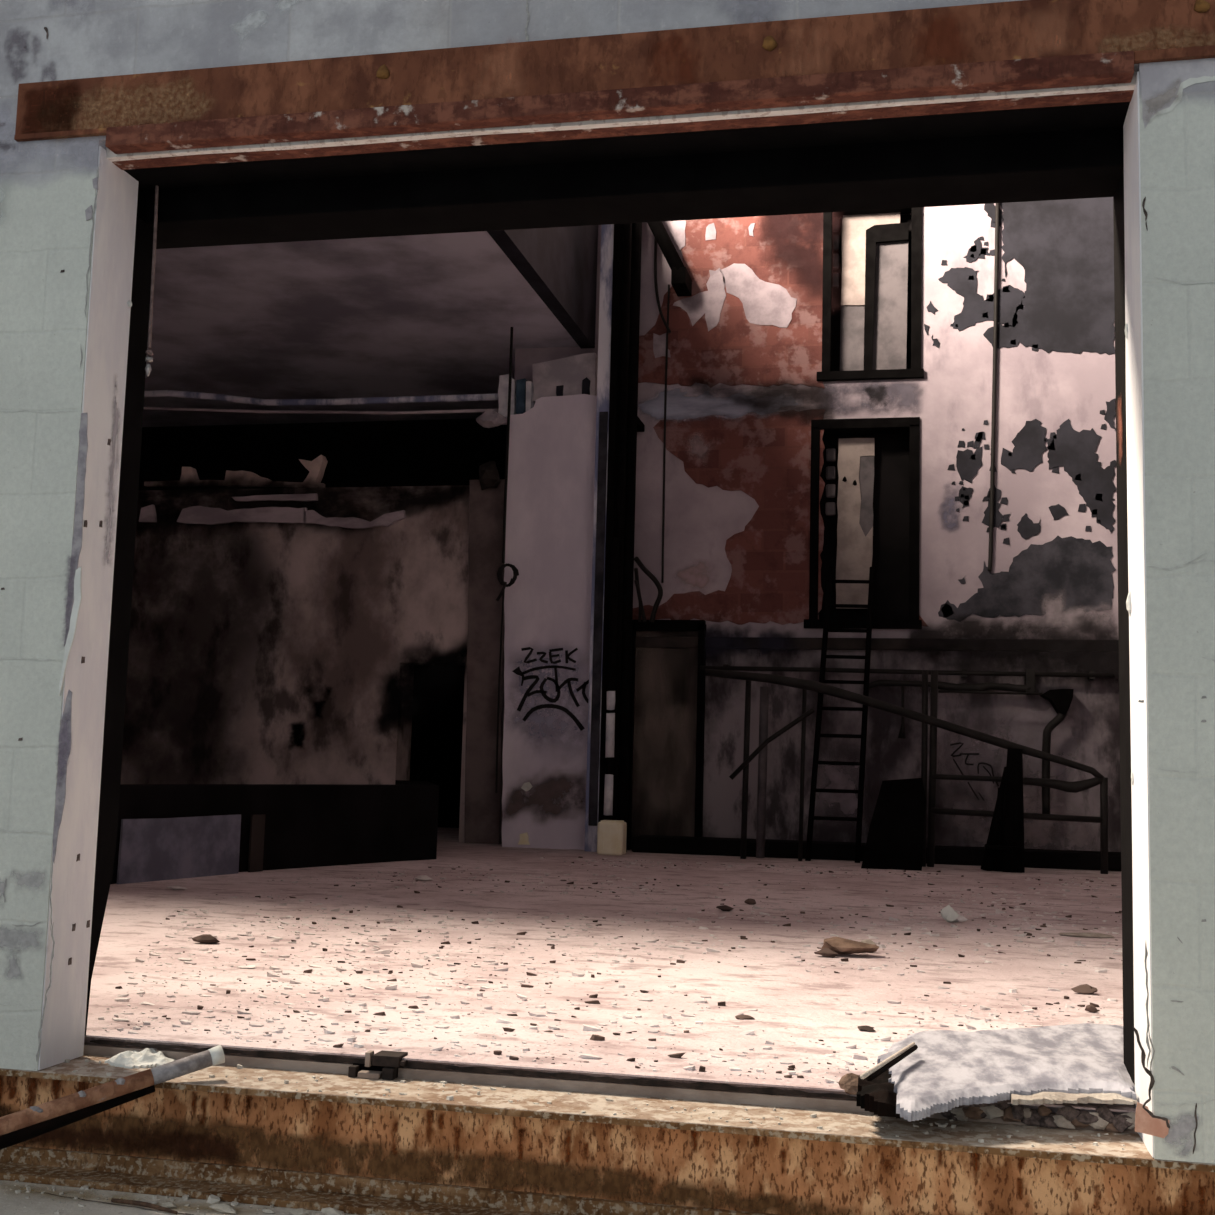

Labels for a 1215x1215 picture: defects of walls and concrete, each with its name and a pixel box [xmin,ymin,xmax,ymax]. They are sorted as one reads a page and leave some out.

damp [8,32,37,81]
corrosion [22,84,79,134]
flaking render [638,216,825,388]
peeling [924,301,940,348]
peeling [938,197,1115,355]
flaking render [633,411,825,625]
peeling [938,399,1116,628]
spalling [1132,1026,1198,1156]
crack [1145,942,1215,1154]